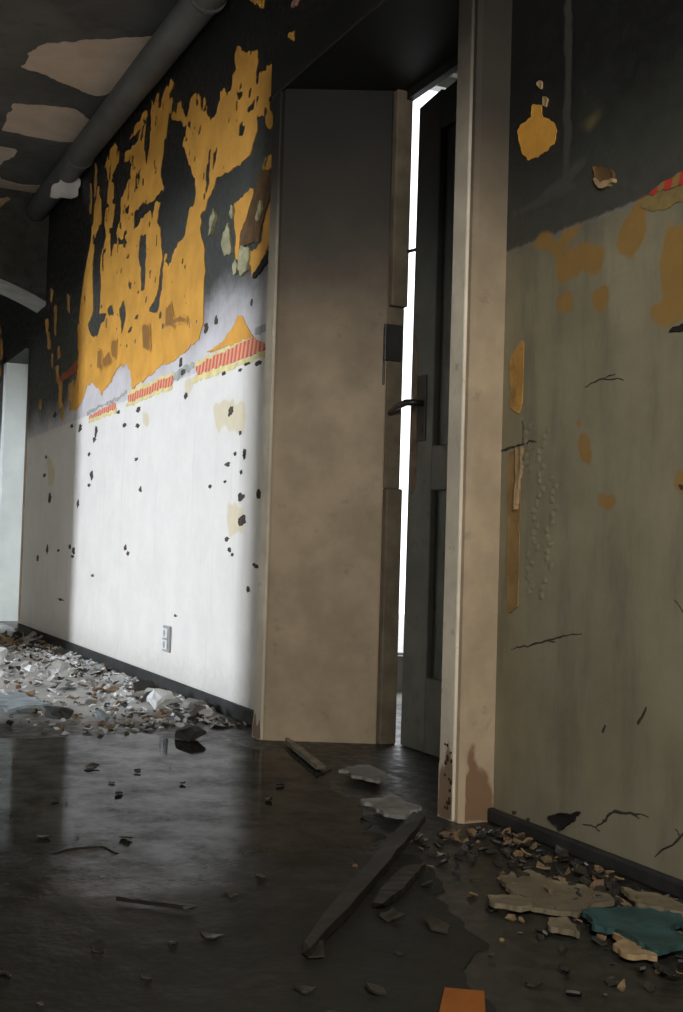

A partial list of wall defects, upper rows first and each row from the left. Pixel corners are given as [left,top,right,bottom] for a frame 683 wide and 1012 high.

peeling [21,36,152,96]
peeling [517,80,557,161]
peeling [0,46,273,432]
crack [583,809,648,832]
crack [655,829,683,857]